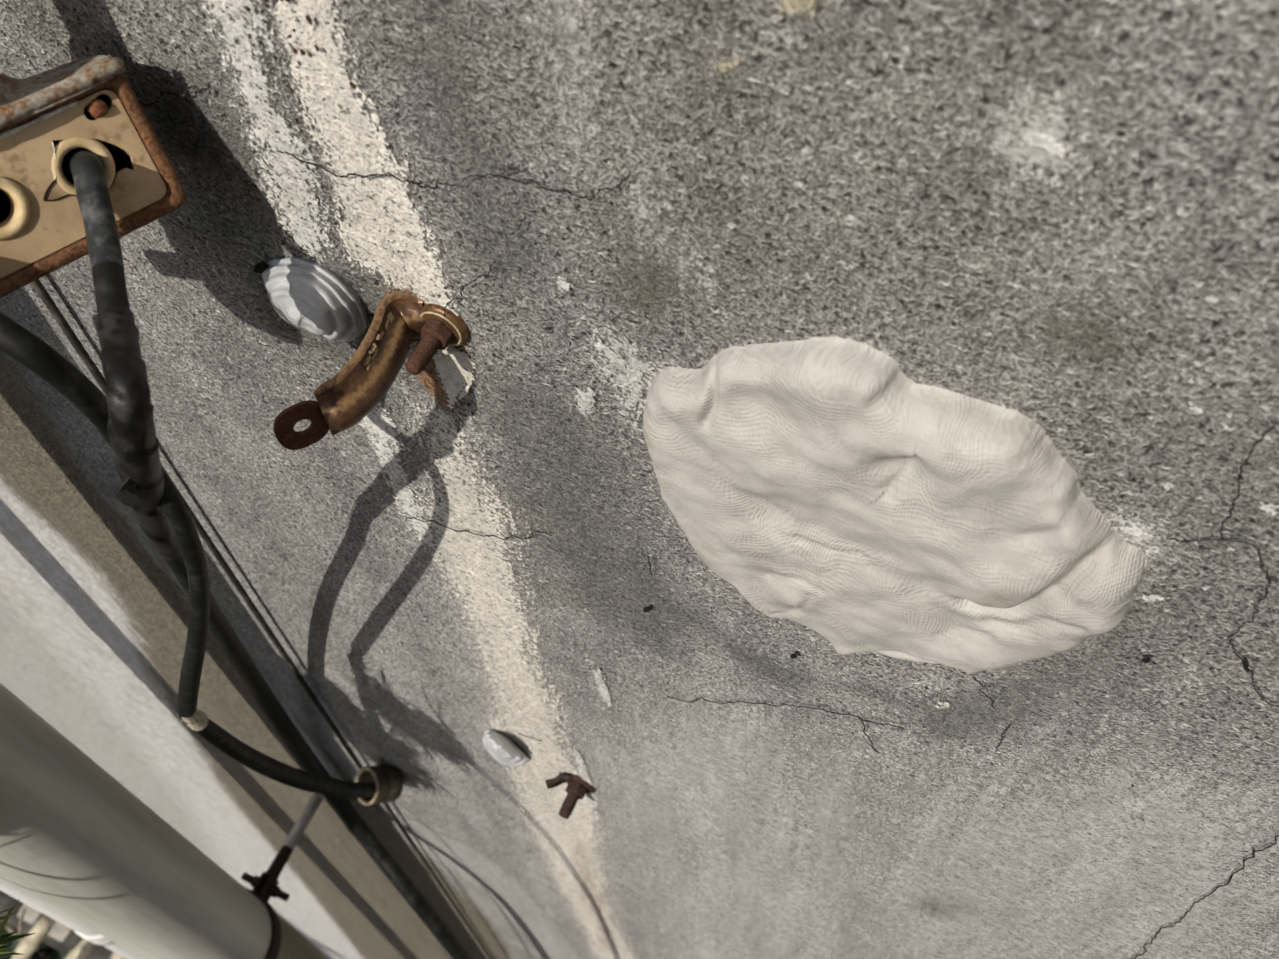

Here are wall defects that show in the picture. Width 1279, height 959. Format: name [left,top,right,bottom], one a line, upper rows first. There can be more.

crack [277,150,630,199]
crack [443,261,496,317]
corrosion [415,344,466,411]
crack [1166,422,1279,707]
crack [667,696,904,754]
crack [973,677,1012,752]
crack [1133,835,1279,959]